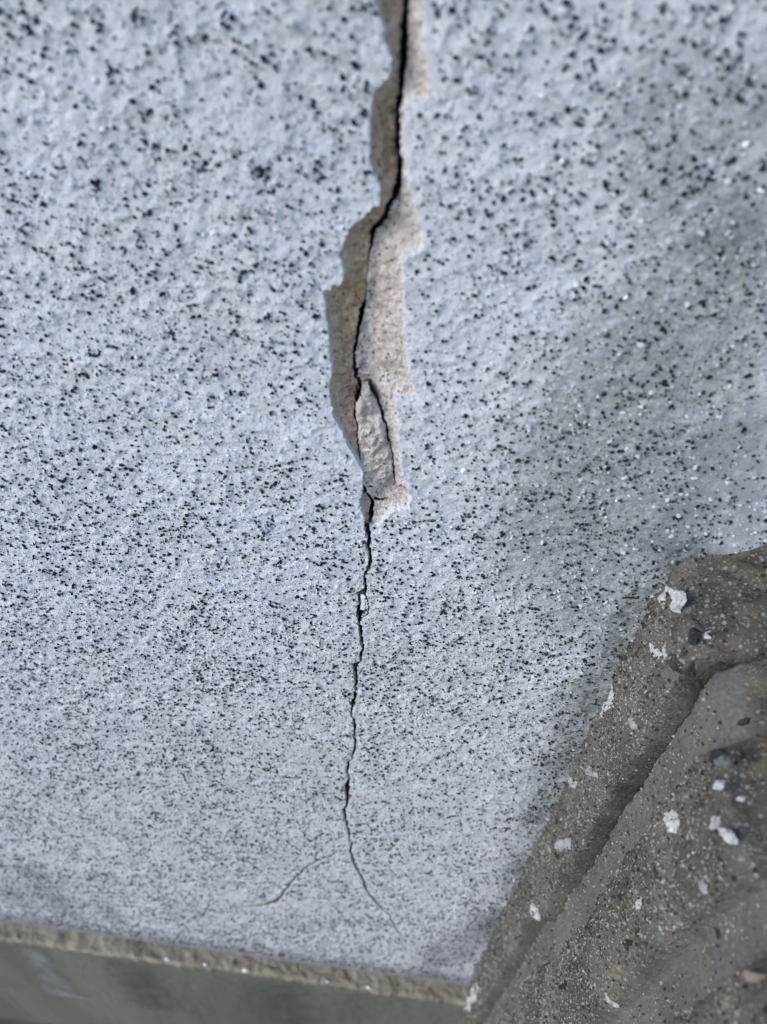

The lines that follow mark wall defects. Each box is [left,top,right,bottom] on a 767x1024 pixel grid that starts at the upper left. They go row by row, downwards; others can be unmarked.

flaking render [325,0,433,537]
crack [207,505,394,922]